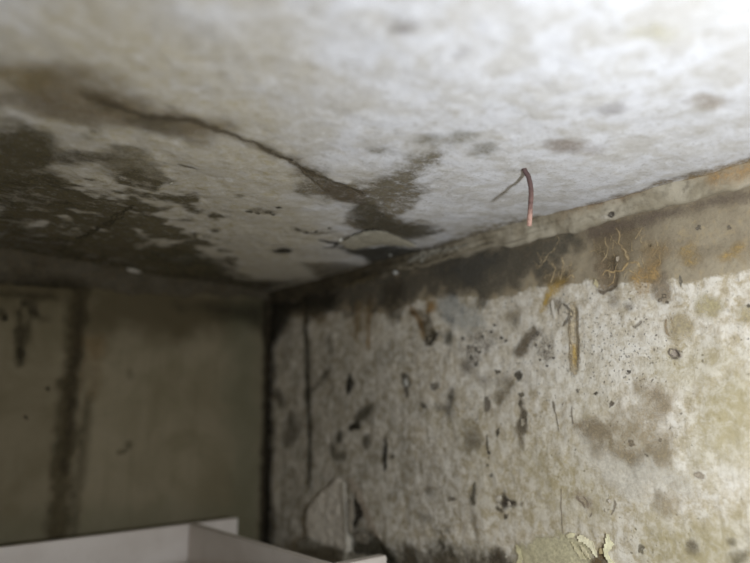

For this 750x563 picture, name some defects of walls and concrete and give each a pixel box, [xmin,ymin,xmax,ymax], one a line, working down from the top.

water stain [25,68,218,136]
crack [101,101,363,194]
water stain [0,125,291,292]
water stain [295,154,444,239]
water stain [269,233,580,350]
water stain [14,283,89,540]
peeling [515,532,615,563]